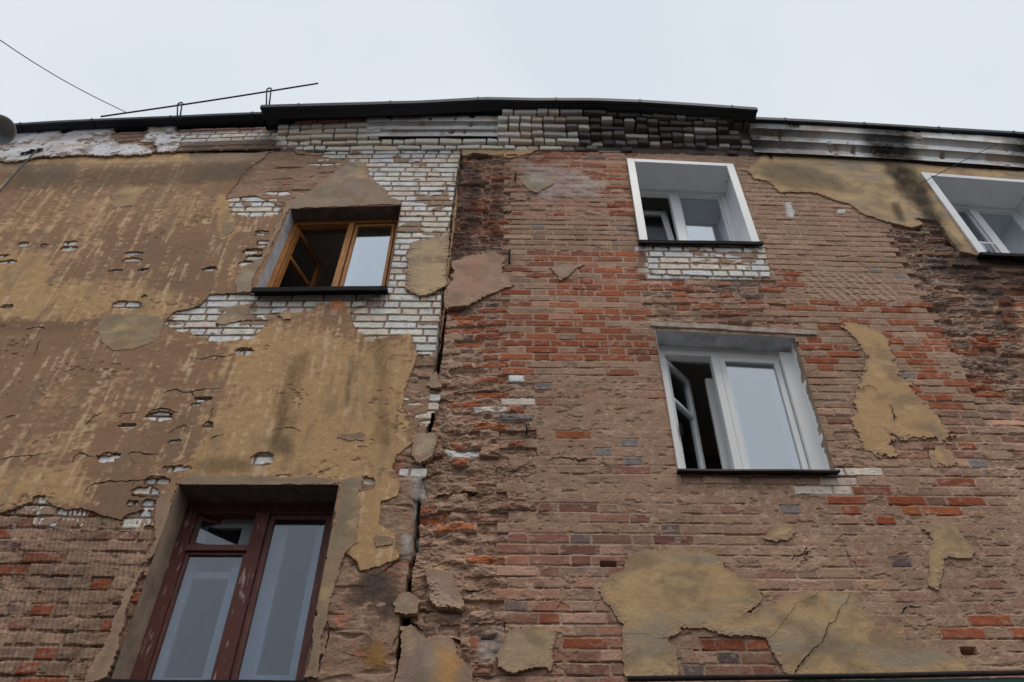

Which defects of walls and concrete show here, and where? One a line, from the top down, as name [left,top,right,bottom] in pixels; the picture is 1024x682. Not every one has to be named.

peeling [0,126,184,165]
peeling [746,154,1024,258]
damp [866,128,942,225]
flaking render [165,150,463,433]
crack [427,287,446,376]
crack [86,388,223,440]
crack [3,450,165,489]
flaking render [0,466,192,682]
crack [319,618,426,672]
flaking render [304,445,465,682]
crack [351,456,611,592]
peeling [598,548,970,681]